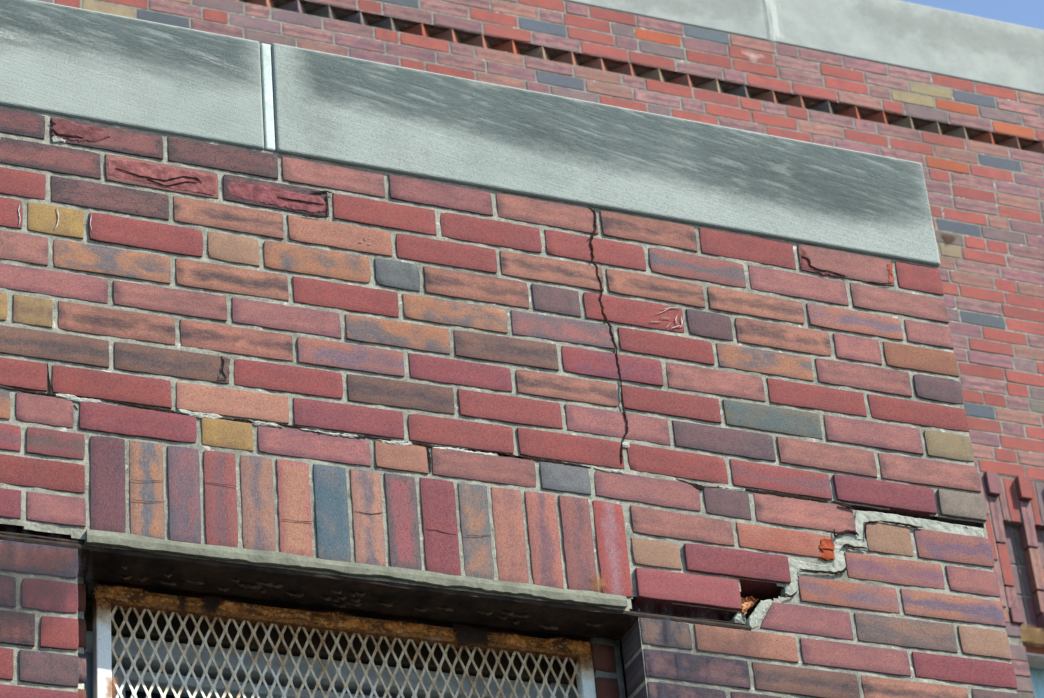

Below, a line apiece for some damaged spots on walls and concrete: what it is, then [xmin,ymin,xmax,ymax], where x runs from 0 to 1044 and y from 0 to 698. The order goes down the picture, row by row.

spalling [51,117,110,143]
spalling [108,159,334,218]
spalling [799,250,893,284]
crack [0,207,630,474]
crack [676,479,984,629]
rust [94,585,592,656]